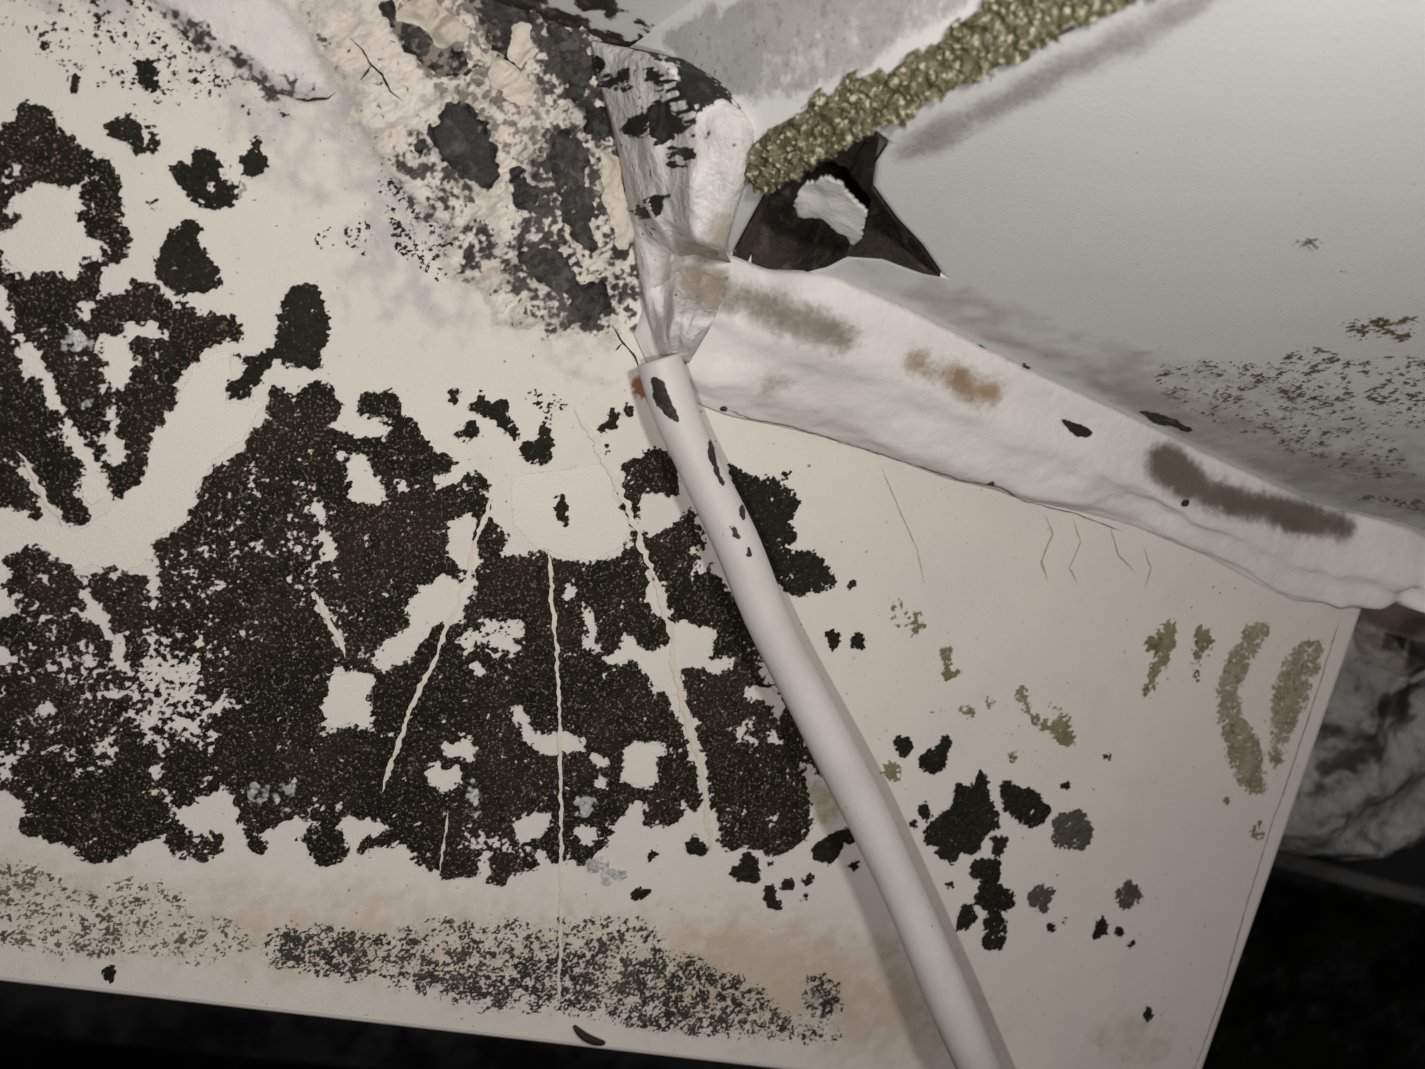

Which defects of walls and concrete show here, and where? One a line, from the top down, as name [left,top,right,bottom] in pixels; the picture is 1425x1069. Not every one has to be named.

leakage [1,0,288,156]
leakage [495,0,740,169]
spalling [299,0,640,340]
spalling [732,131,941,277]
leakage [0,99,866,1046]
leakage [893,734,952,775]
leakage [909,769,1094,951]
leakage [1092,879,1144,949]
leakage [1143,1007,1154,1022]